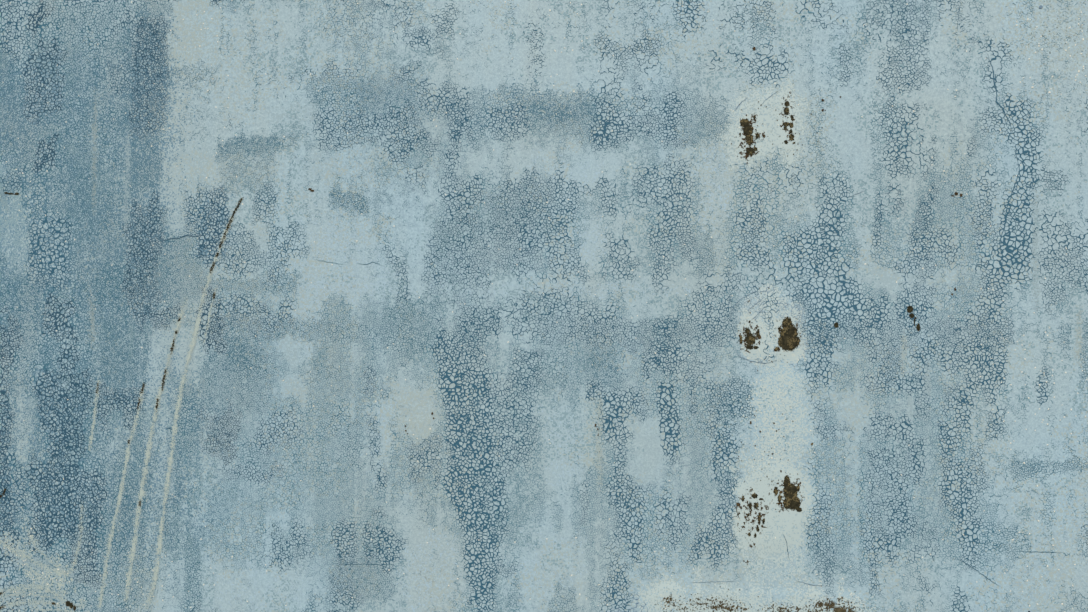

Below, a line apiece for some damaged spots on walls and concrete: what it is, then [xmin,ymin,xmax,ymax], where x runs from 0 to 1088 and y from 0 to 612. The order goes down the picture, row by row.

crack [705,0,789,104]
rust [739,113,766,164]
rust [779,91,795,144]
crack [796,0,853,88]
crack [863,0,939,181]
crack [935,0,978,39]
crack [0,0,757,612]
rust [737,318,763,352]
rust [773,317,803,352]
crack [734,34,1088,597]
rust [734,470,803,547]
rust [657,593,865,612]